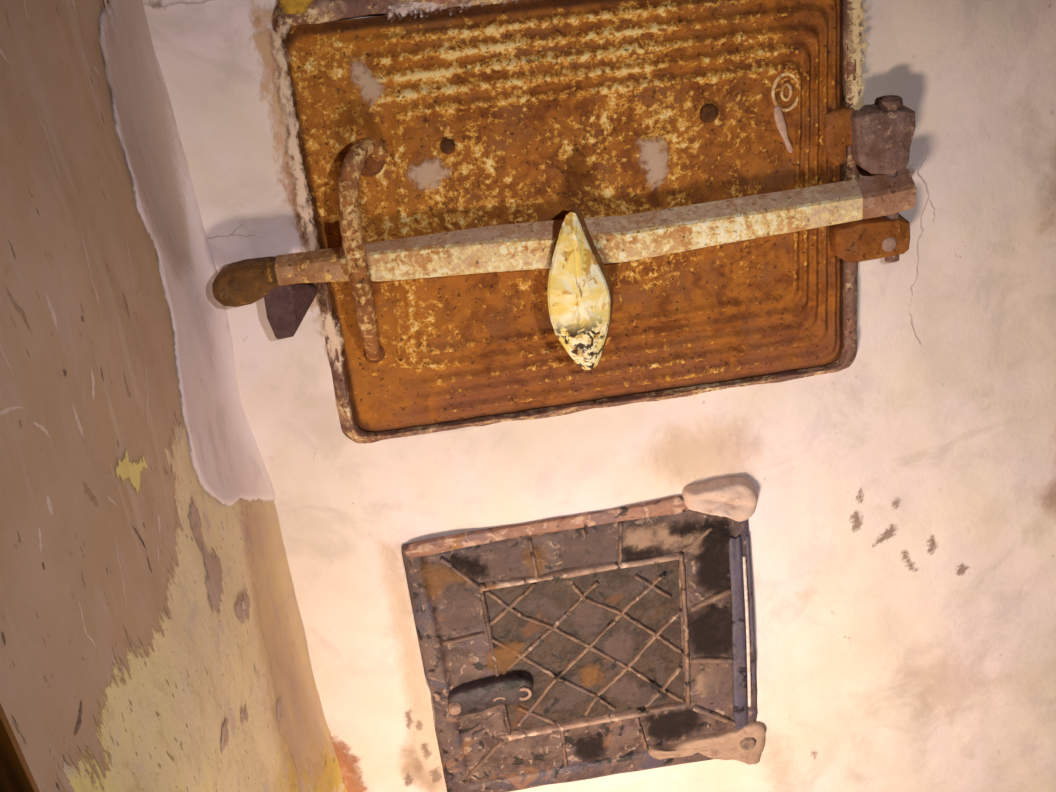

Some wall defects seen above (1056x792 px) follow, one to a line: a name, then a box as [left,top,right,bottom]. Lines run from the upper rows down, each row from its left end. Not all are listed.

rust [253,8,310,251]
crack [910,153,935,346]
flaking render [331,737,366,792]